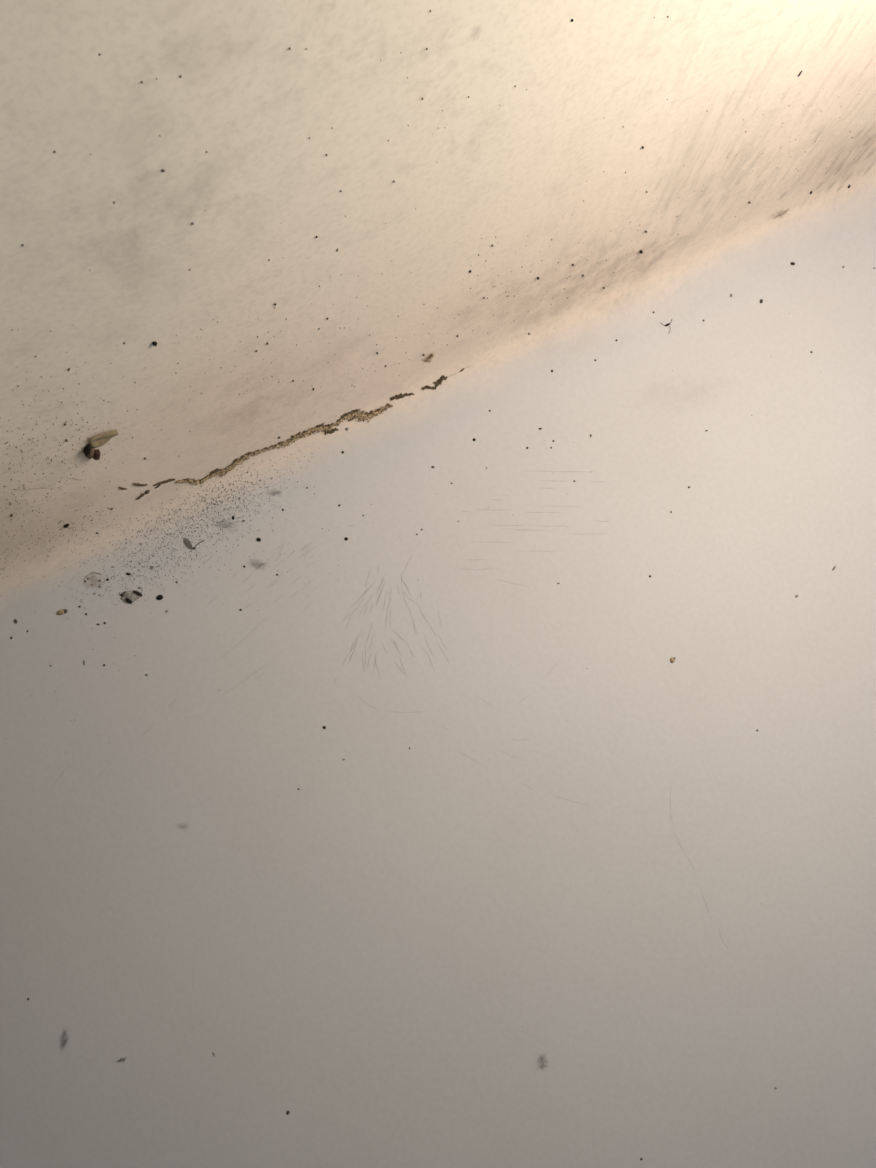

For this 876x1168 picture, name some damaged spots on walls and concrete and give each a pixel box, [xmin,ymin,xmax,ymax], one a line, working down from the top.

crack [119,368,465,500]